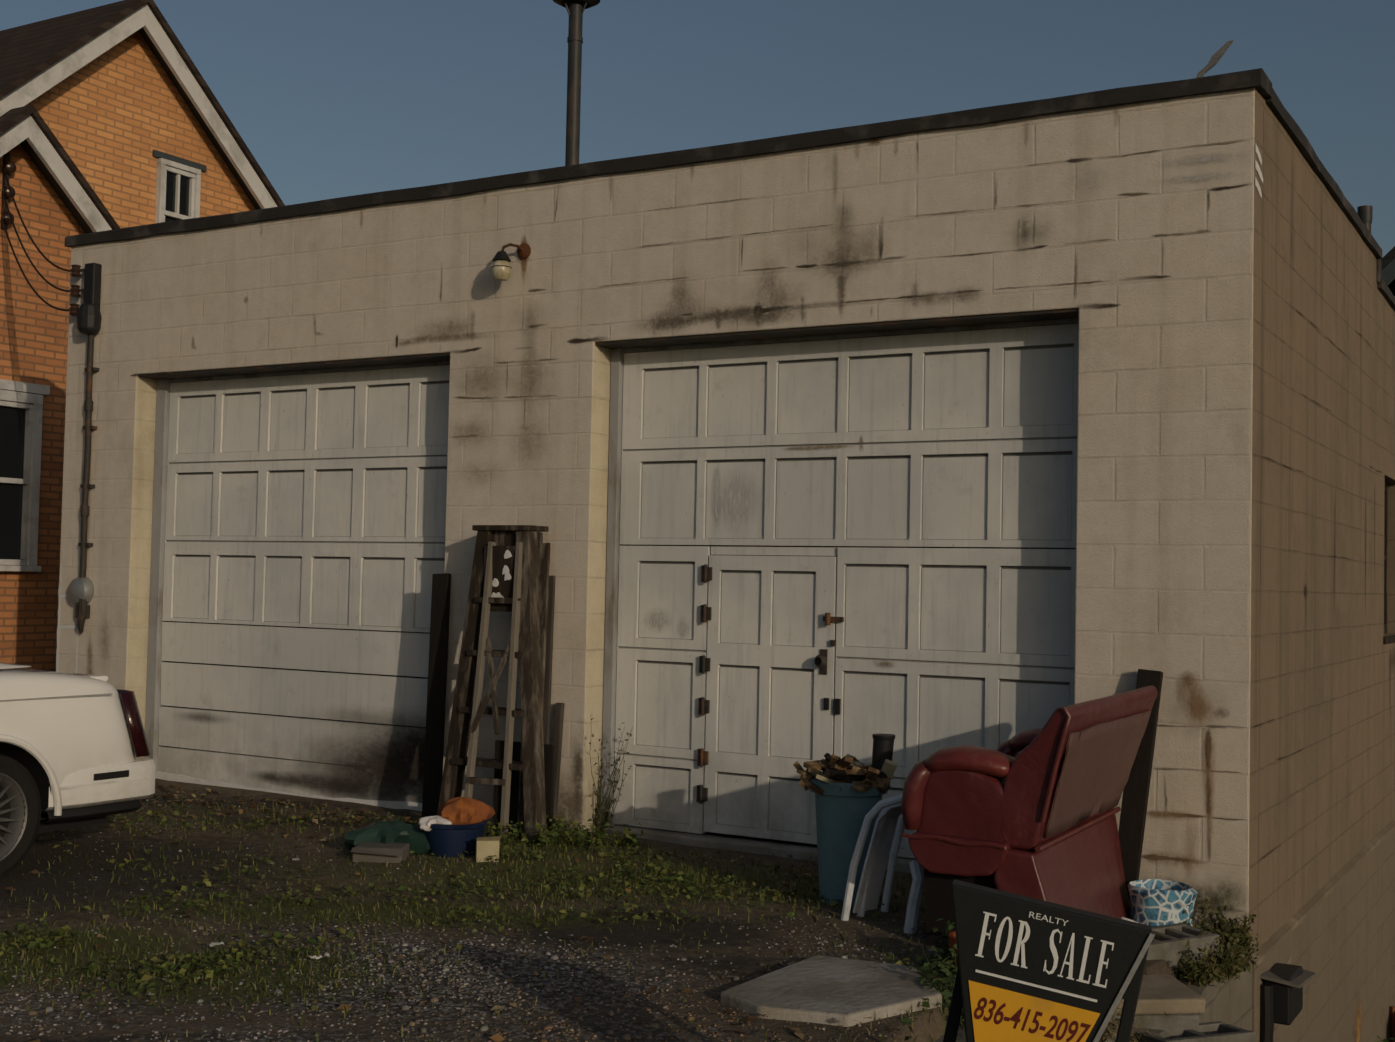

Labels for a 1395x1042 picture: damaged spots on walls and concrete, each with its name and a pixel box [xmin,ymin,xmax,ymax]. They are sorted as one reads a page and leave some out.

damp [657,309,775,327]